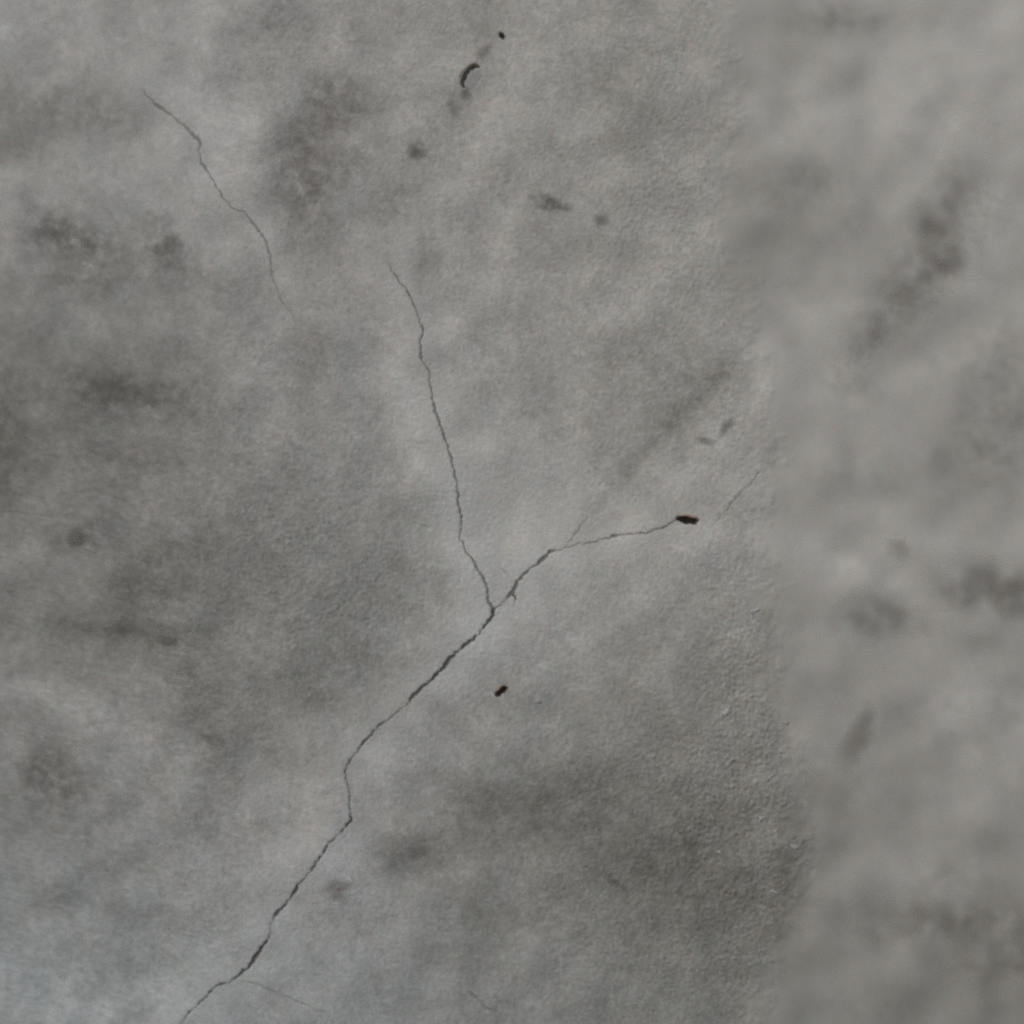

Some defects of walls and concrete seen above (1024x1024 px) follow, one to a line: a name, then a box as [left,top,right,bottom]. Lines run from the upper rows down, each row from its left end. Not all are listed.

crack [144,91,294,317]
crack [180,264,678,1024]